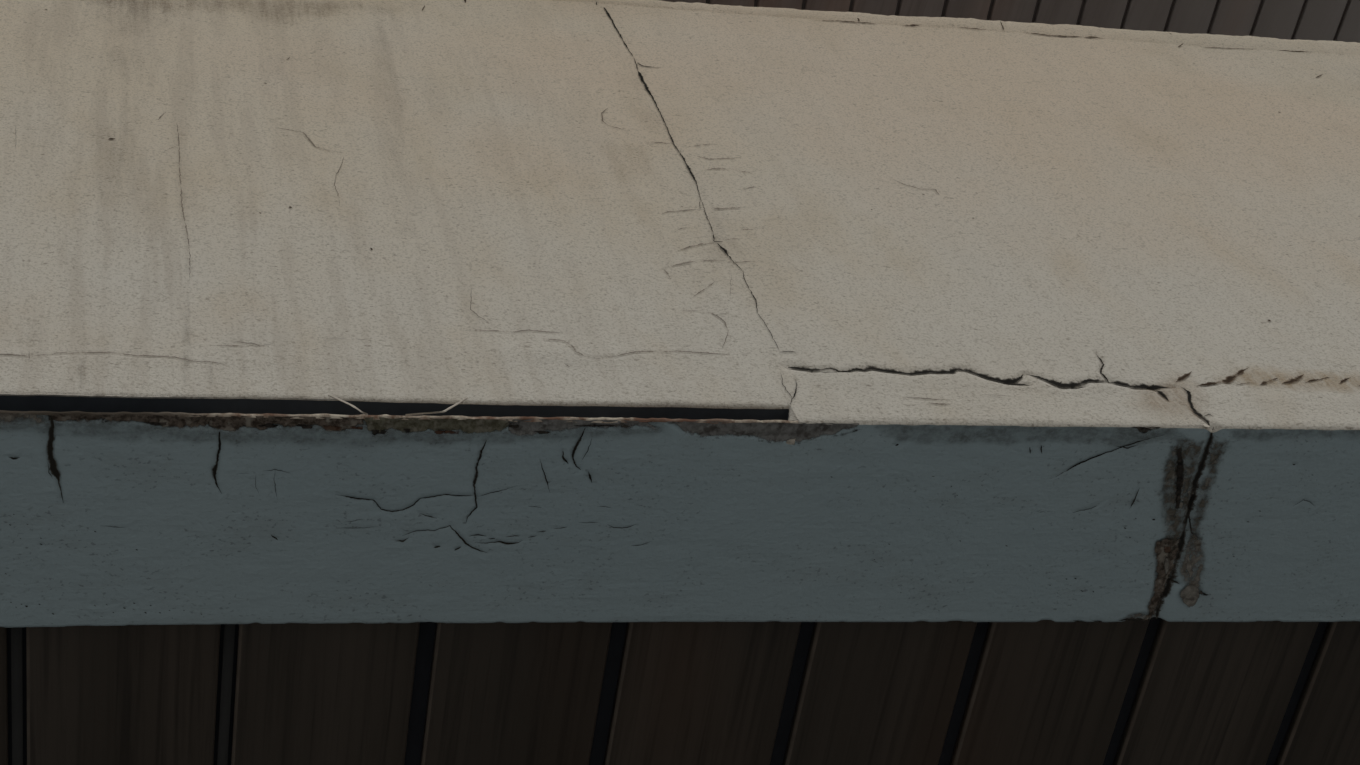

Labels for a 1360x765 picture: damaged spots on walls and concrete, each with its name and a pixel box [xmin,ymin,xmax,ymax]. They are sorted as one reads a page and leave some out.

crack [470,2,1351,425]
crack [47,415,63,500]
crack [212,432,289,496]
spalling [49,414,859,443]
crack [335,429,592,522]
crack [1059,435,1162,475]